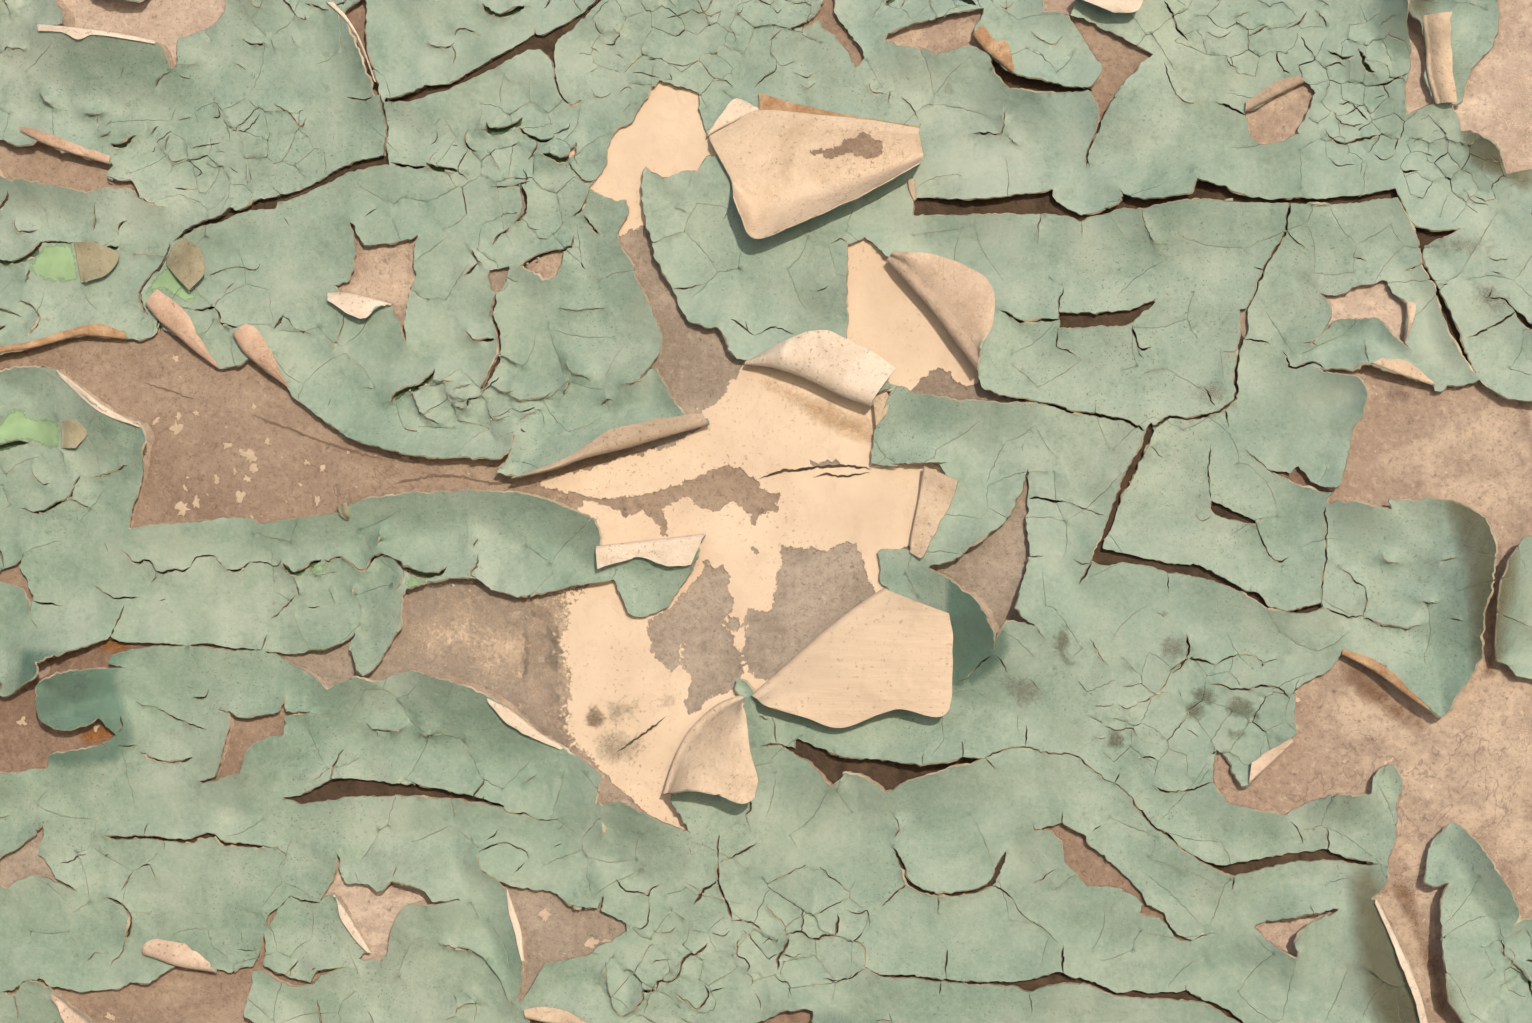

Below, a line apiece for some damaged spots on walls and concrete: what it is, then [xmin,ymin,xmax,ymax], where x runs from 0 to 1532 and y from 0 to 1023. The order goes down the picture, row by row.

peeling [0,0,710,479]
crack [114,0,711,331]
crack [914,0,1532,629]
crack [0,441,27,451]
crack [113,554,446,616]
peeling [0,198,1498,1023]
crack [759,464,869,479]
peeling [1213,0,1532,1023]
crack [62,833,266,960]
crack [286,753,560,870]
crack [626,801,1243,1023]
crack [785,637,1373,884]